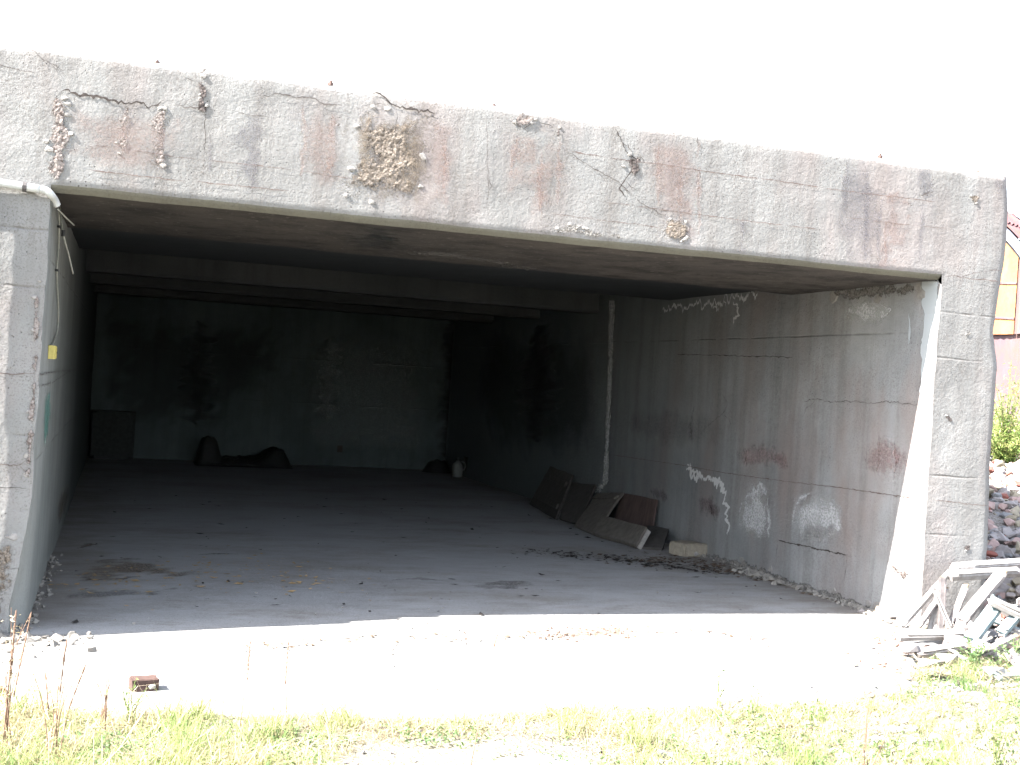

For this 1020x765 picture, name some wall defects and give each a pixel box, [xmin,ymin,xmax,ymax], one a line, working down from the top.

spalling [43,96,74,179]
crack [1,49,198,113]
spalling [187,69,209,150]
crack [239,93,337,117]
spalling [344,104,427,204]
crack [371,92,435,131]
crack [556,129,932,254]
spalling [666,218,689,243]
water stain [792,494,841,533]
spalling [0,533,18,623]
crack [776,540,847,580]